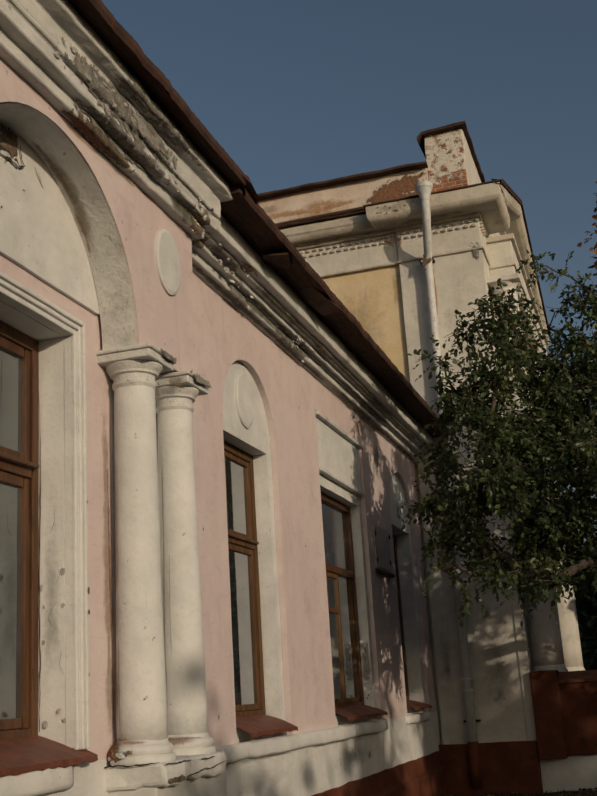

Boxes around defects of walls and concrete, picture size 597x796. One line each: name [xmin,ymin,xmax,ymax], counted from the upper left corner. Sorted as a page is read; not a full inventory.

spalling [53,37,207,192]
spalling [0,124,25,169]
spalling [367,169,426,214]
spalling [190,198,257,283]
crack [105,756,215,768]